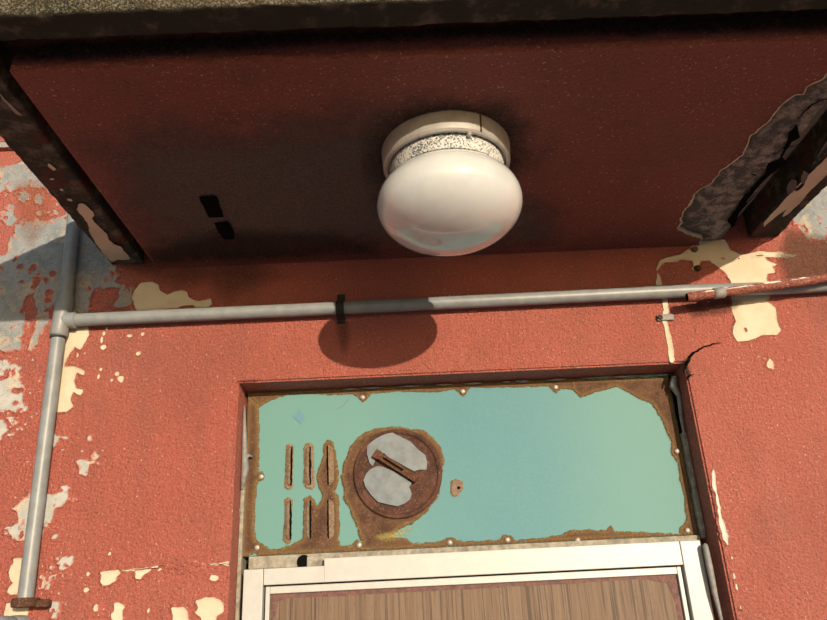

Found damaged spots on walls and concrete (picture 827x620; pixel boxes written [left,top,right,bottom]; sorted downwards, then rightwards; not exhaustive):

spalling [654,74,827,283]
peeling [0,160,214,443]
crack [656,273,722,380]
peeling [729,295,783,344]
peeling [2,479,31,544]
peeling [41,430,104,542]
corrosion [243,377,698,557]
peeling [709,467,733,559]
peeling [1,555,33,618]
peeling [36,552,127,620]
peeling [133,567,154,581]
peeling [169,594,227,620]